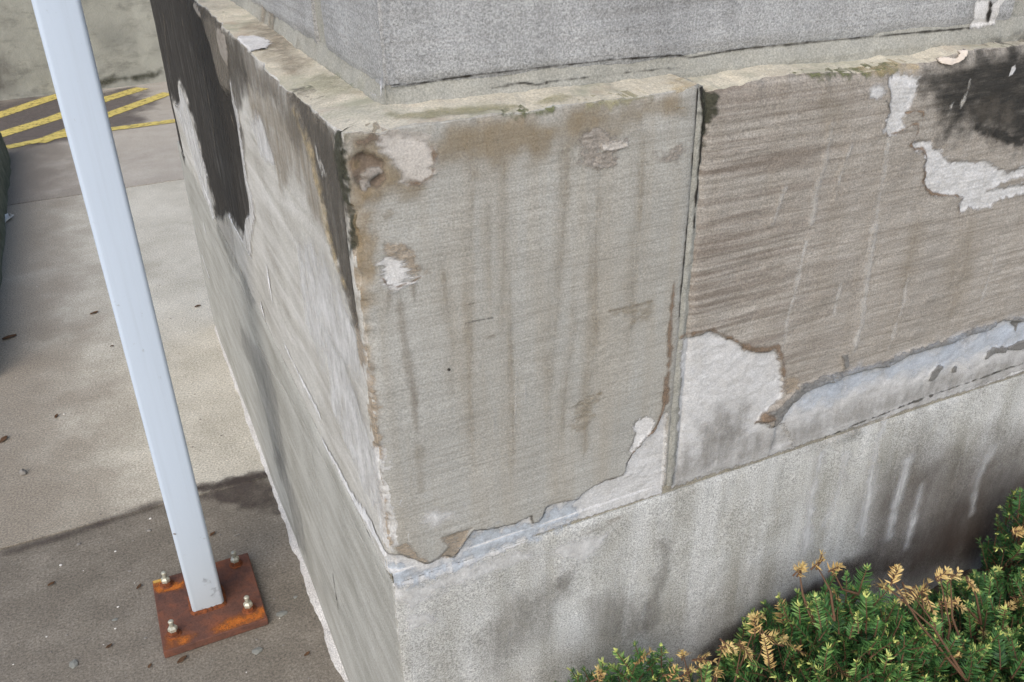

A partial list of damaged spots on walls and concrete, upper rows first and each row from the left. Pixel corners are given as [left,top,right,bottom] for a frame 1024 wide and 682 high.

leakage [150,0,339,235]
leakage [375,140,411,184]
leakage [920,43,1024,146]
leakage [298,246,388,557]
peeling [293,73,1024,587]